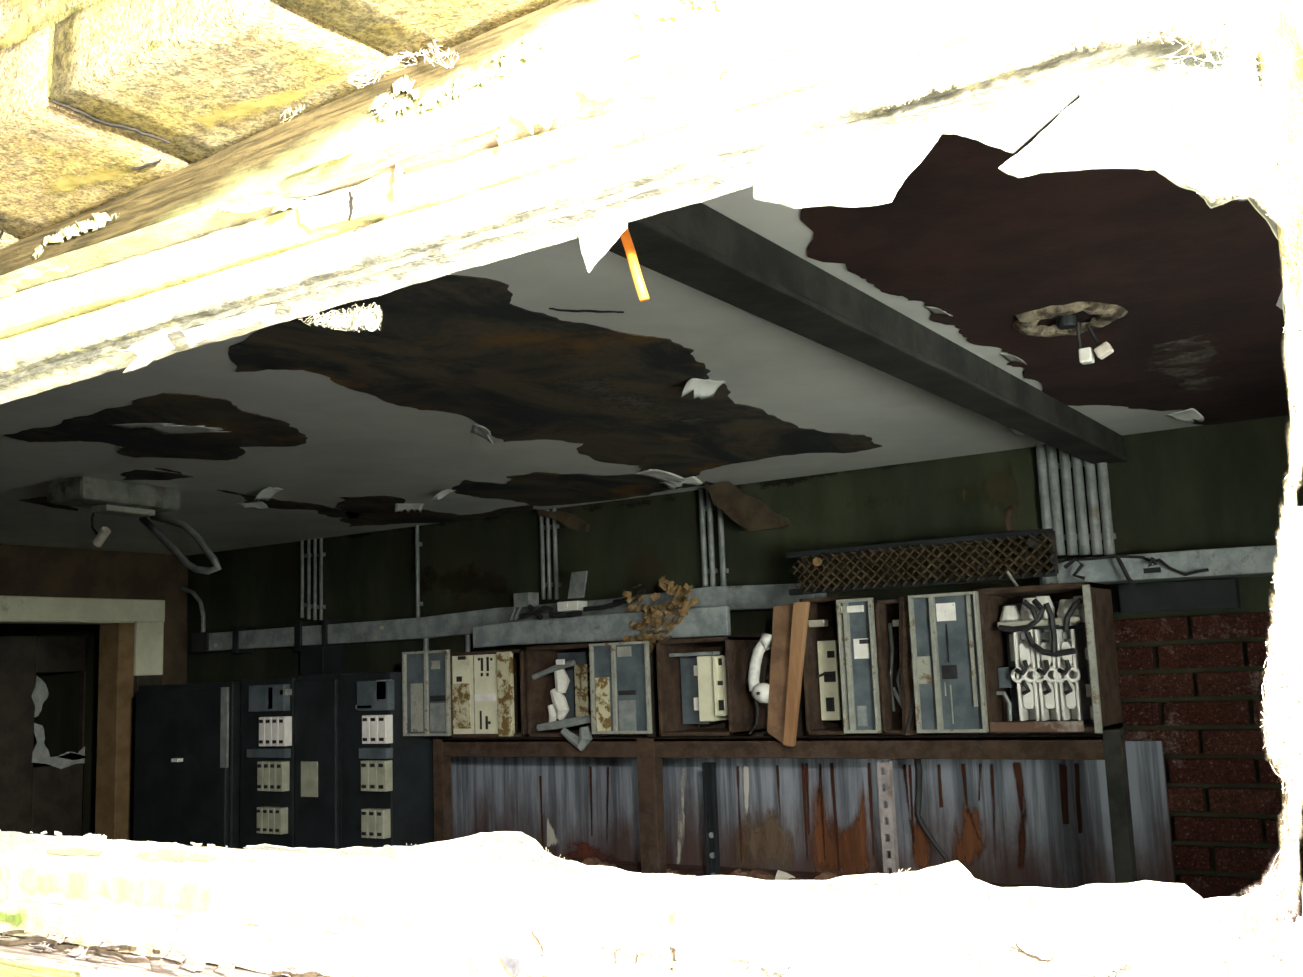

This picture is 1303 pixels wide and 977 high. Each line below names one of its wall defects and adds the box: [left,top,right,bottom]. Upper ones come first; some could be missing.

crack [52,100,170,171]
peeling [216,14,647,231]
peeling [800,75,1291,425]
peeling [3,393,308,480]
peeling [181,275,882,527]
corrosion [735,763,875,875]
corrosion [903,764,930,869]
peeling [1061,948,1146,977]